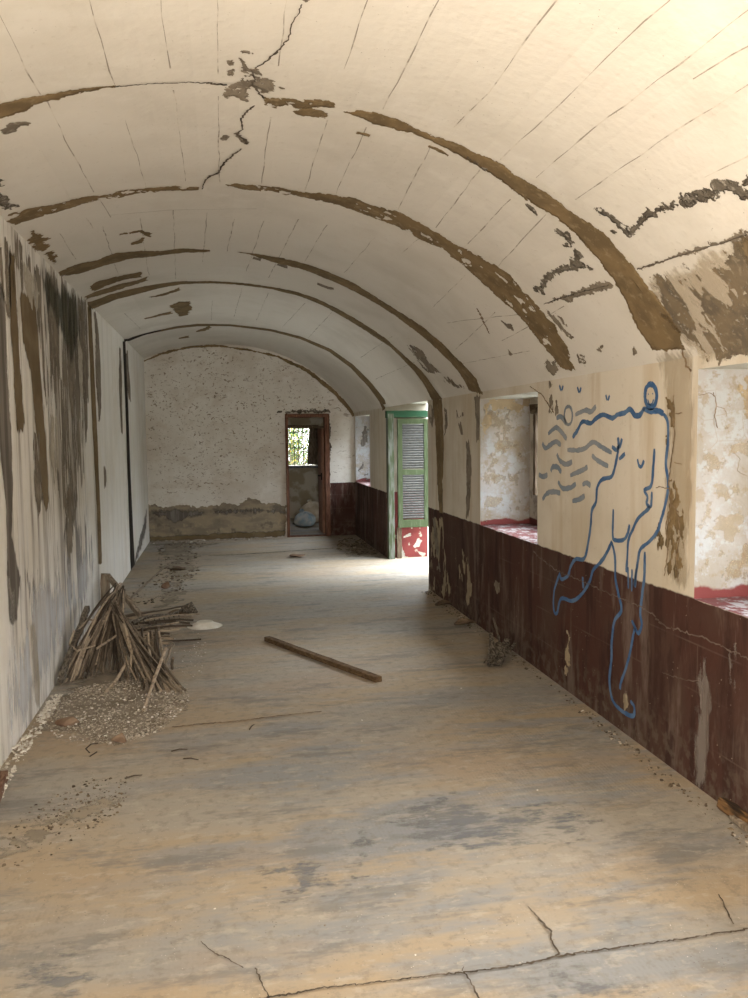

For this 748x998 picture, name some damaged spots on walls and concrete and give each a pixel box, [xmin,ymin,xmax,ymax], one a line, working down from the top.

flaking render [0,85,116,134]
crack [115,80,227,88]
crack [202,4,302,189]
flaking render [222,50,748,419]
flaking render [0,179,530,606]
water stain [0,252,90,724]
water stain [135,509,285,562]
crack [201,894,748,998]